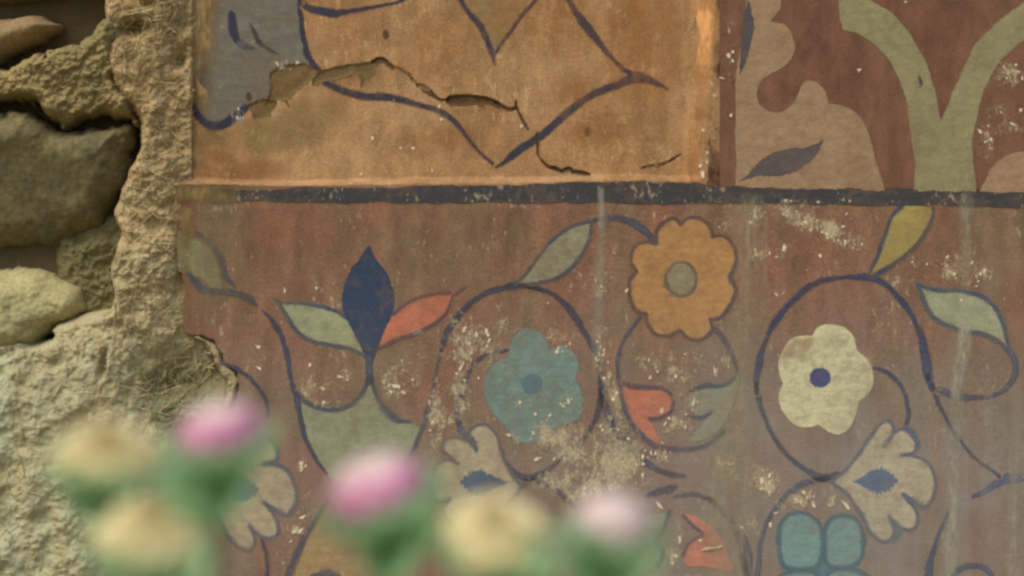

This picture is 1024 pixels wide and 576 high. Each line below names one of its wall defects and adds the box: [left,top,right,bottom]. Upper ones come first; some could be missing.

flaking render [236,61,379,120]
crack [371,57,445,101]
crack [496,100,591,176]
crack [640,154,681,170]
flaking render [188,335,239,401]